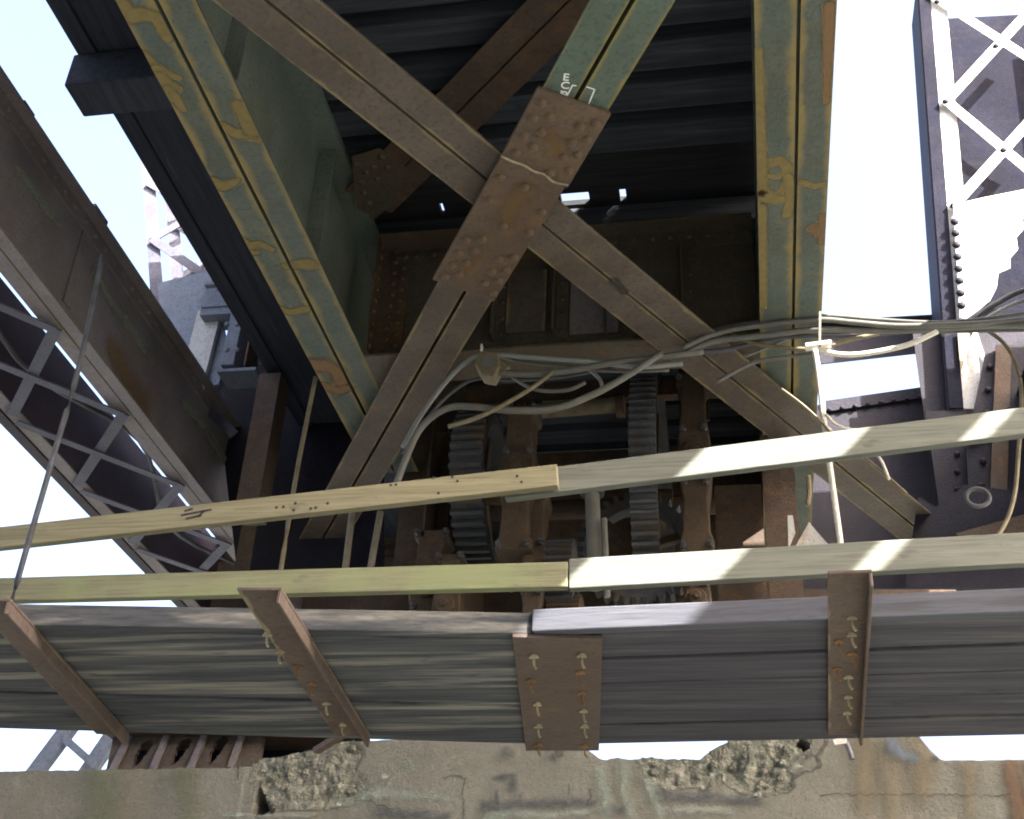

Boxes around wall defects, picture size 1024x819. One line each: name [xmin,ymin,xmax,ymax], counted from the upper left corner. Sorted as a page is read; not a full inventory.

spalling [250,740,369,813]
spalling [637,739,812,799]